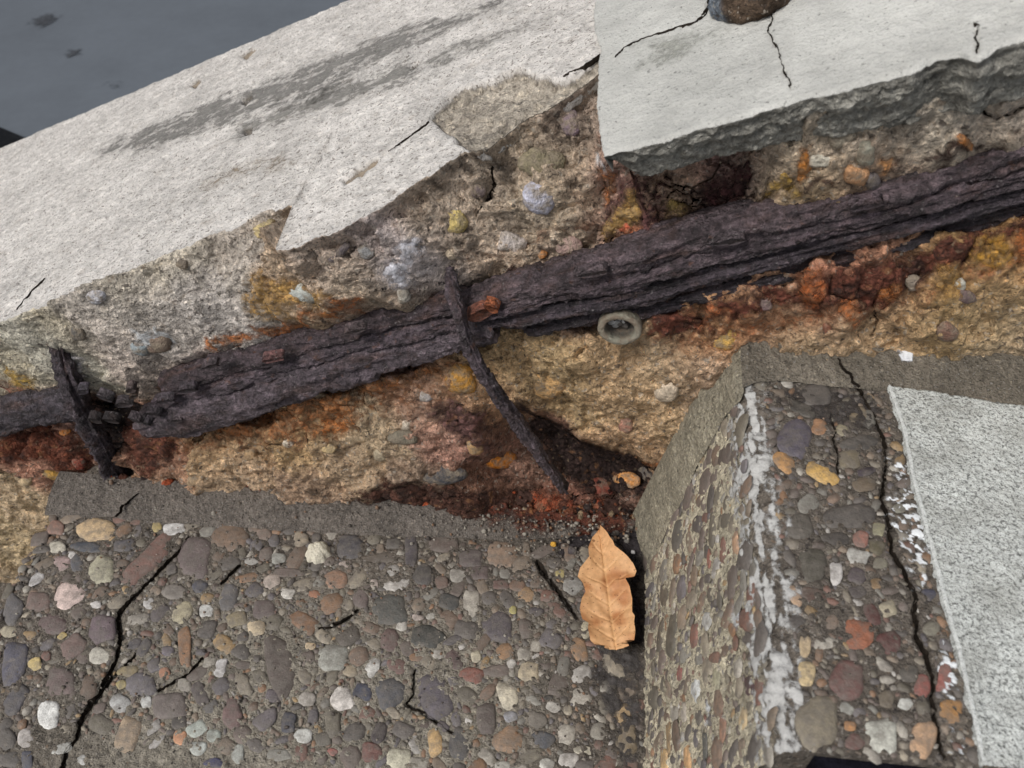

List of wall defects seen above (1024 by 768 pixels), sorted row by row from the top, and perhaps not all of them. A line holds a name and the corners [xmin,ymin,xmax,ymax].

corrosion [0,367,94,473]
spalling [0,422,99,584]
crack [60,536,189,768]
crack [388,121,429,152]
corrosion [350,398,659,537]
spalling [0,42,1024,413]
corrosion [76,133,1024,479]
spalling [111,215,1024,517]
crack [563,0,709,77]
crack [767,13,792,90]
leakage [727,385,878,766]
crack [837,358,946,760]